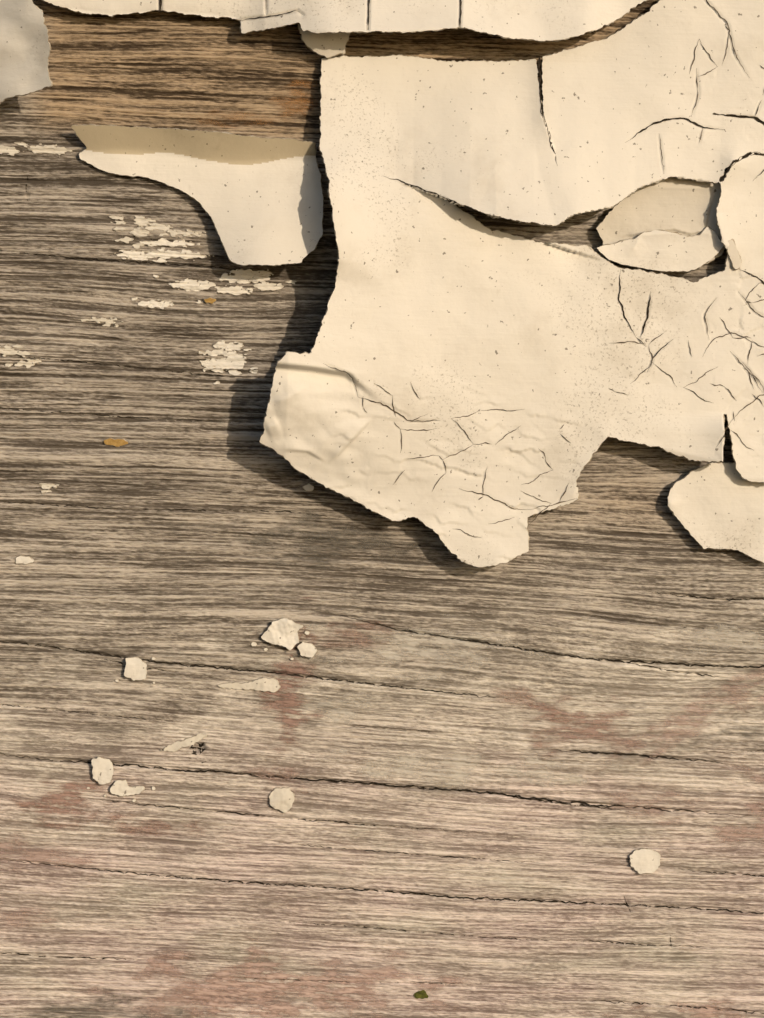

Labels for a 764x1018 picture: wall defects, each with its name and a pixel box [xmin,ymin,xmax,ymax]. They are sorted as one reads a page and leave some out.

crack [387,177,474,212]
crack [538,57,558,166]
crack [625,0,764,167]
crack [722,152,764,179]
peeling [0,0,764,568]
crack [608,269,764,450]
crack [325,364,522,491]
crack [458,449,573,538]
crack [309,610,764,677]
crack [2,753,764,817]